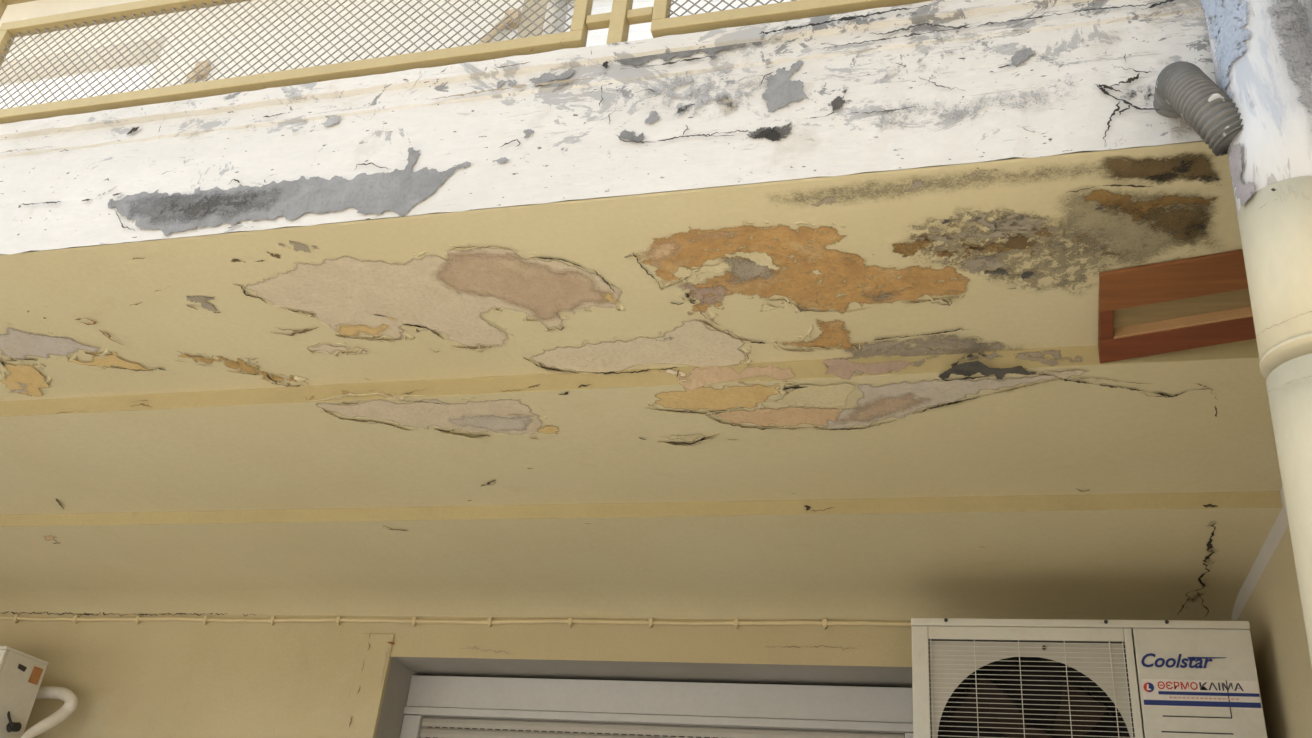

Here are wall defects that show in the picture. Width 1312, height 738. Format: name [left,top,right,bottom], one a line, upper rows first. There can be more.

spalling [497,69,575,88]
spalling [602,5,927,143]
peeling [812,84,1071,126]
spalling [998,48,1035,68]
crack [1095,54,1160,142]
spalling [82,147,471,236]
leakage [795,154,1220,294]
peeling [186,296,221,313]
peeling [0,311,558,439]
peeling [231,241,626,356]
peeling [524,213,1082,431]
crack [1178,504,1218,616]